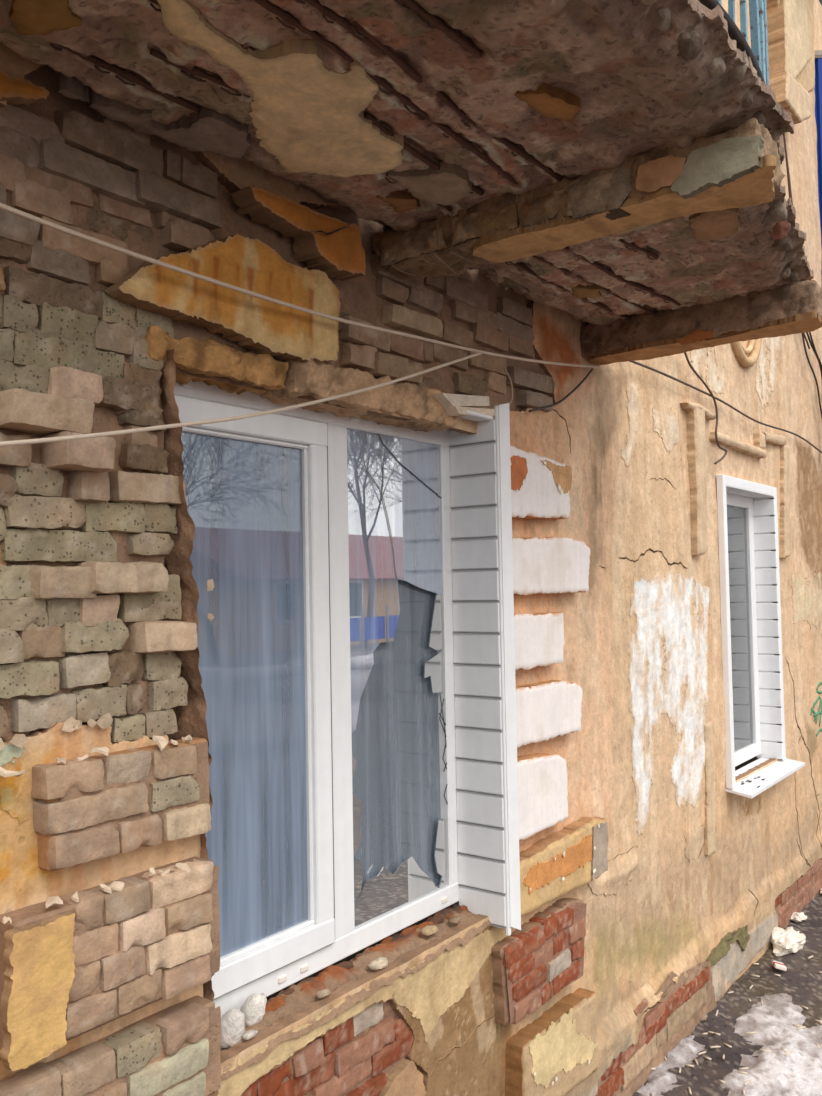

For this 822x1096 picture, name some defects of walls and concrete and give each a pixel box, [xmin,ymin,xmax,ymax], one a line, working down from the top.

spalling [254,0,354,63]
spalling [50,43,201,113]
spalling [150,48,250,97]
spalling [294,0,518,185]
flaking render [310,137,632,412]
spalling [505,246,681,320]
flaking render [0,64,345,869]
peeling [510,455,528,492]
peeling [540,459,572,494]
crack [599,548,687,569]
crack [786,660,822,867]
flaking render [589,960,717,1096]